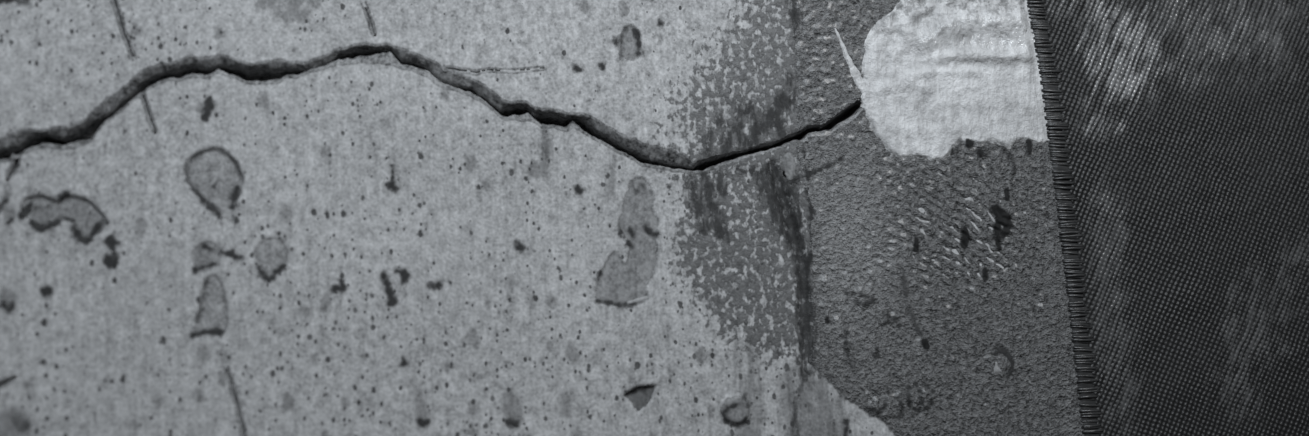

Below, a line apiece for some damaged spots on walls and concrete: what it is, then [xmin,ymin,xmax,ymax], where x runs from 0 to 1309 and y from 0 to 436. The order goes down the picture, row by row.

crack [0,0,862,379]